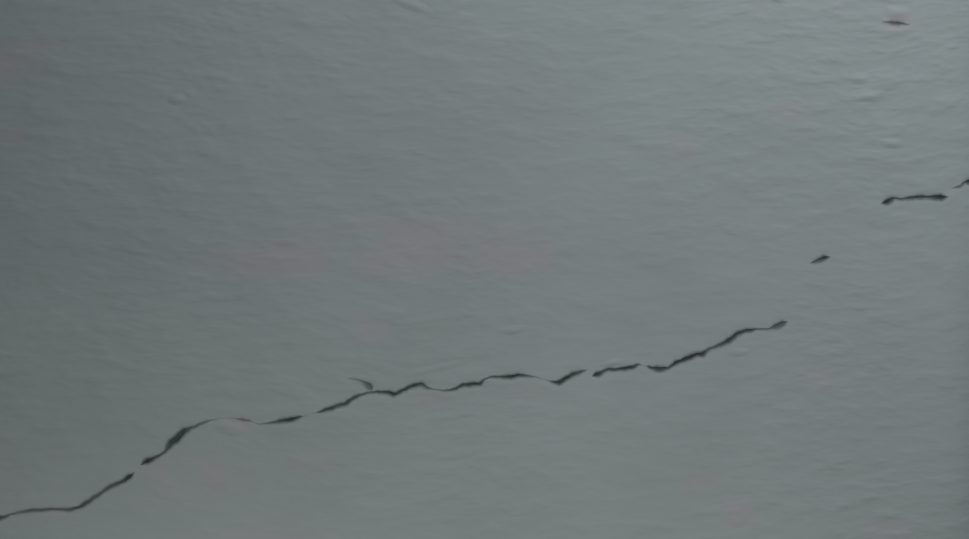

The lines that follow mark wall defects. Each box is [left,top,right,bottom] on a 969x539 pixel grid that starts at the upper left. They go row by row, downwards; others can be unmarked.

crack [881,180,969,204]
crack [0,321,788,519]